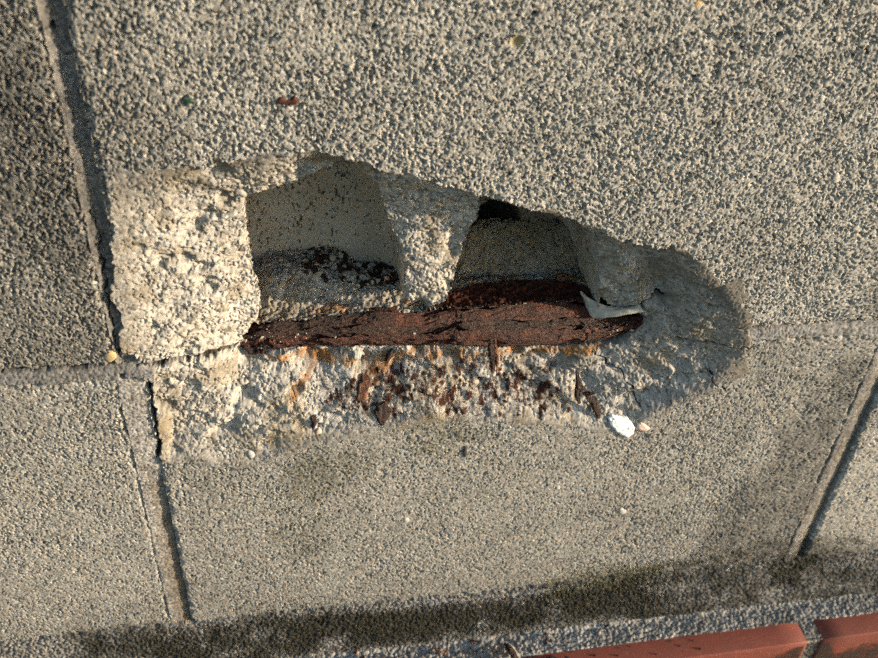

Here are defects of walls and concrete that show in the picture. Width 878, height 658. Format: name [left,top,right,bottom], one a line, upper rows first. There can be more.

crack [3,209,239,464]
spalling [107,149,754,470]
corrosion [240,273,643,426]
leakage [70,493,878,658]